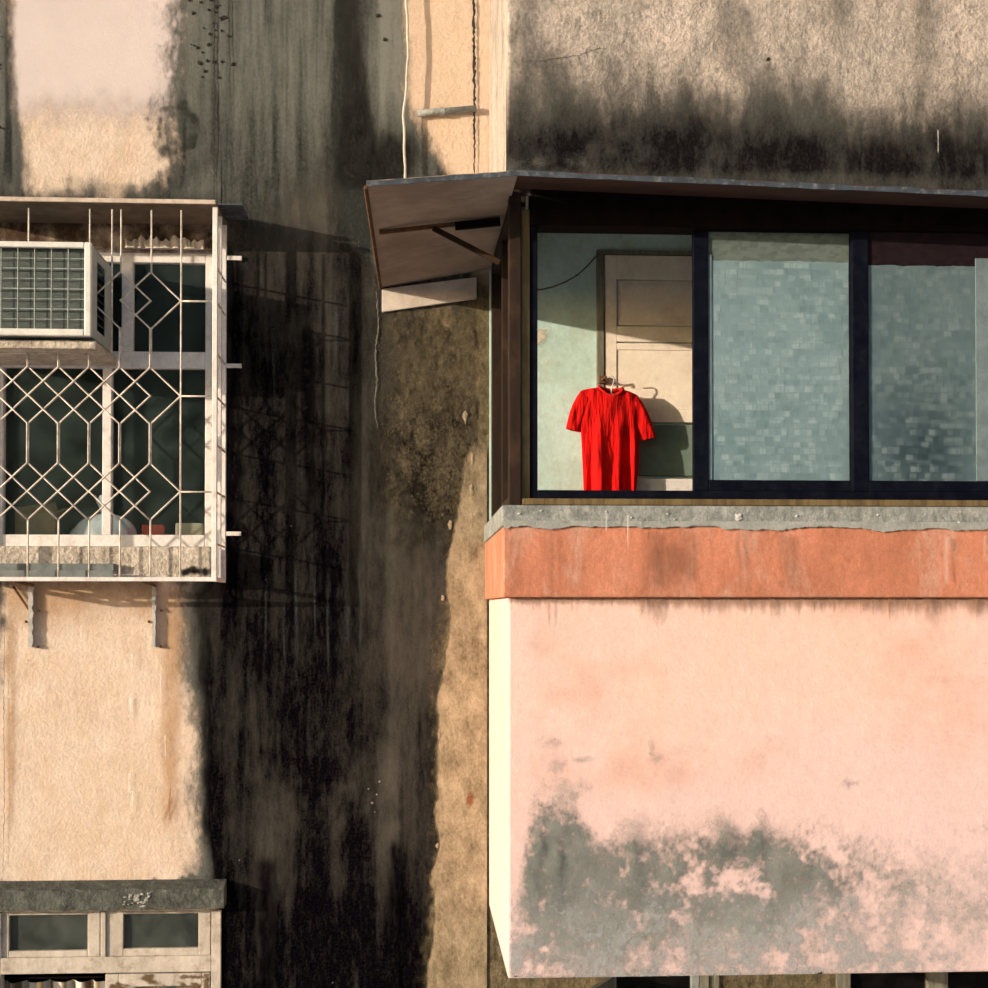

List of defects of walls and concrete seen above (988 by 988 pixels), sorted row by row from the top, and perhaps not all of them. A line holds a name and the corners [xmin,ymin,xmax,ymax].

water stain [0,0,108,198]
water stain [506,53,988,190]
water stain [0,222,213,254]
water stain [122,0,477,988]
water stain [16,581,151,606]
water stain [508,597,988,612]
water stain [509,805,918,978]
peeling [180,973,209,988]